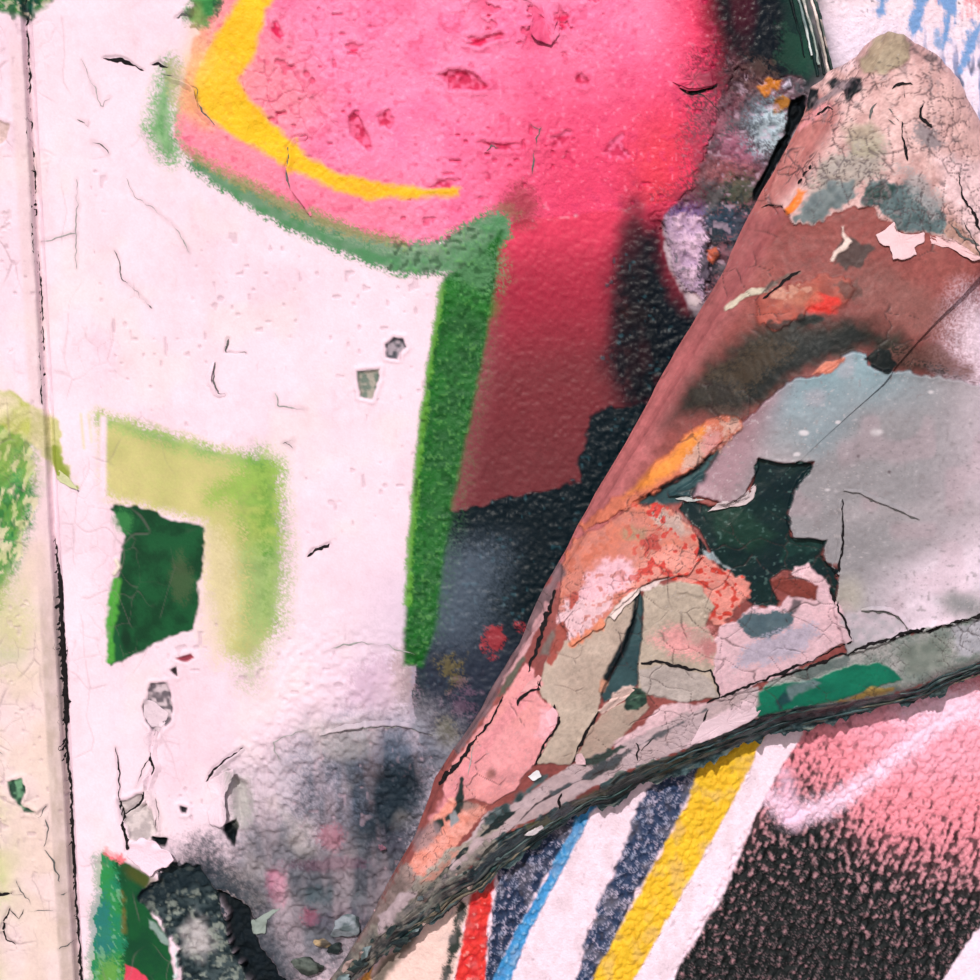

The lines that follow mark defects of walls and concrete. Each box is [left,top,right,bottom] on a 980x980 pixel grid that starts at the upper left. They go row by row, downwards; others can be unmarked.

peeling [530,0,560,45]
crack [285,135,312,216]
peeling [330,31,980,980]
peeling [142,653,196,753]
crack [0,539,83,980]
spalling [118,769,246,980]
peeling [251,909,279,934]